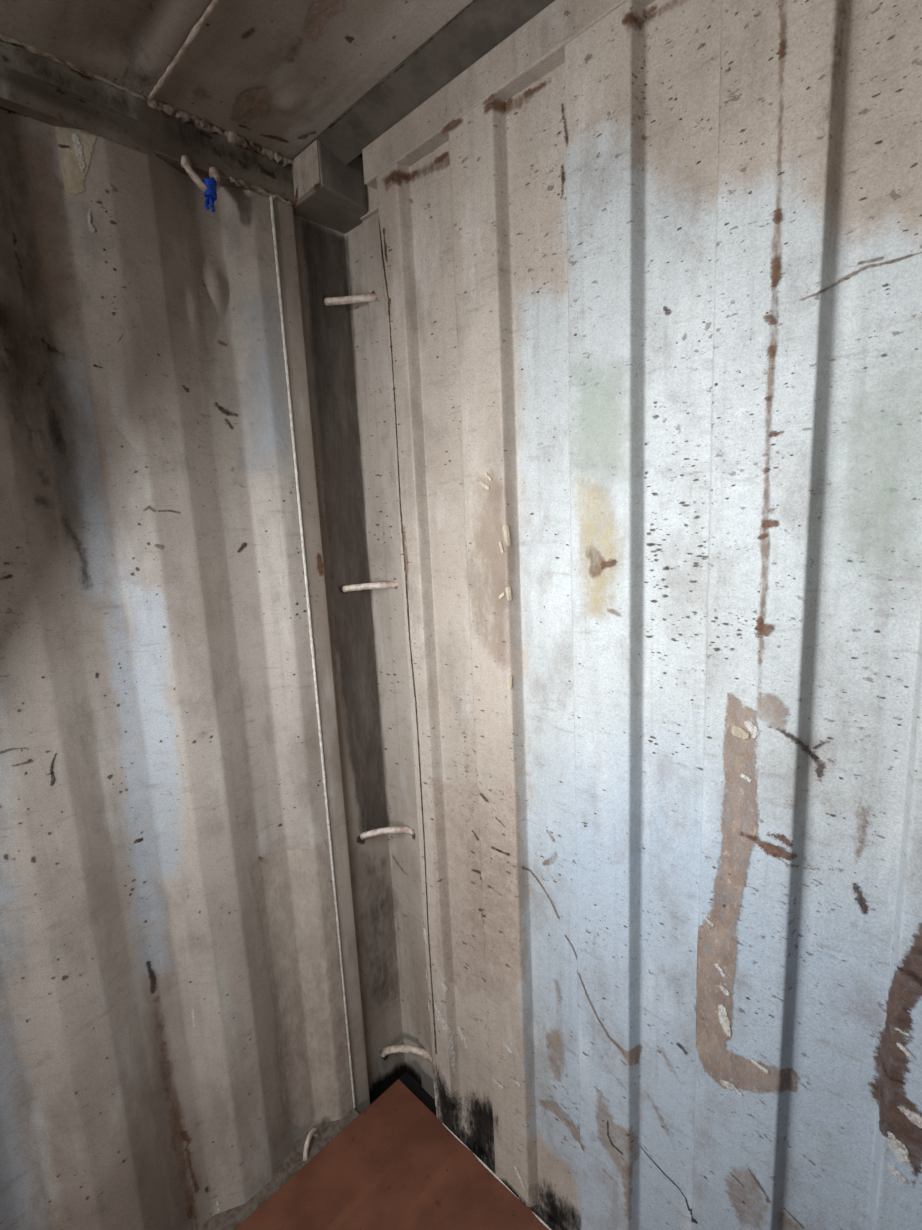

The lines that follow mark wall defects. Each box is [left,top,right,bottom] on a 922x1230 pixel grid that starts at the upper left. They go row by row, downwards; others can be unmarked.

corrosion [611,0,676,43]
corrosion [735,0,813,81]
corrosion [383,152,450,186]
corrosion [428,109,461,133]
corrosion [644,191,805,770]
corrosion [735,678,843,779]
peeling [676,694,799,1095]
peeling [869,923,922,1183]
leakage [369,1064,495,1168]
peeling [596,1097,636,1219]
leakage [539,1189,581,1230]